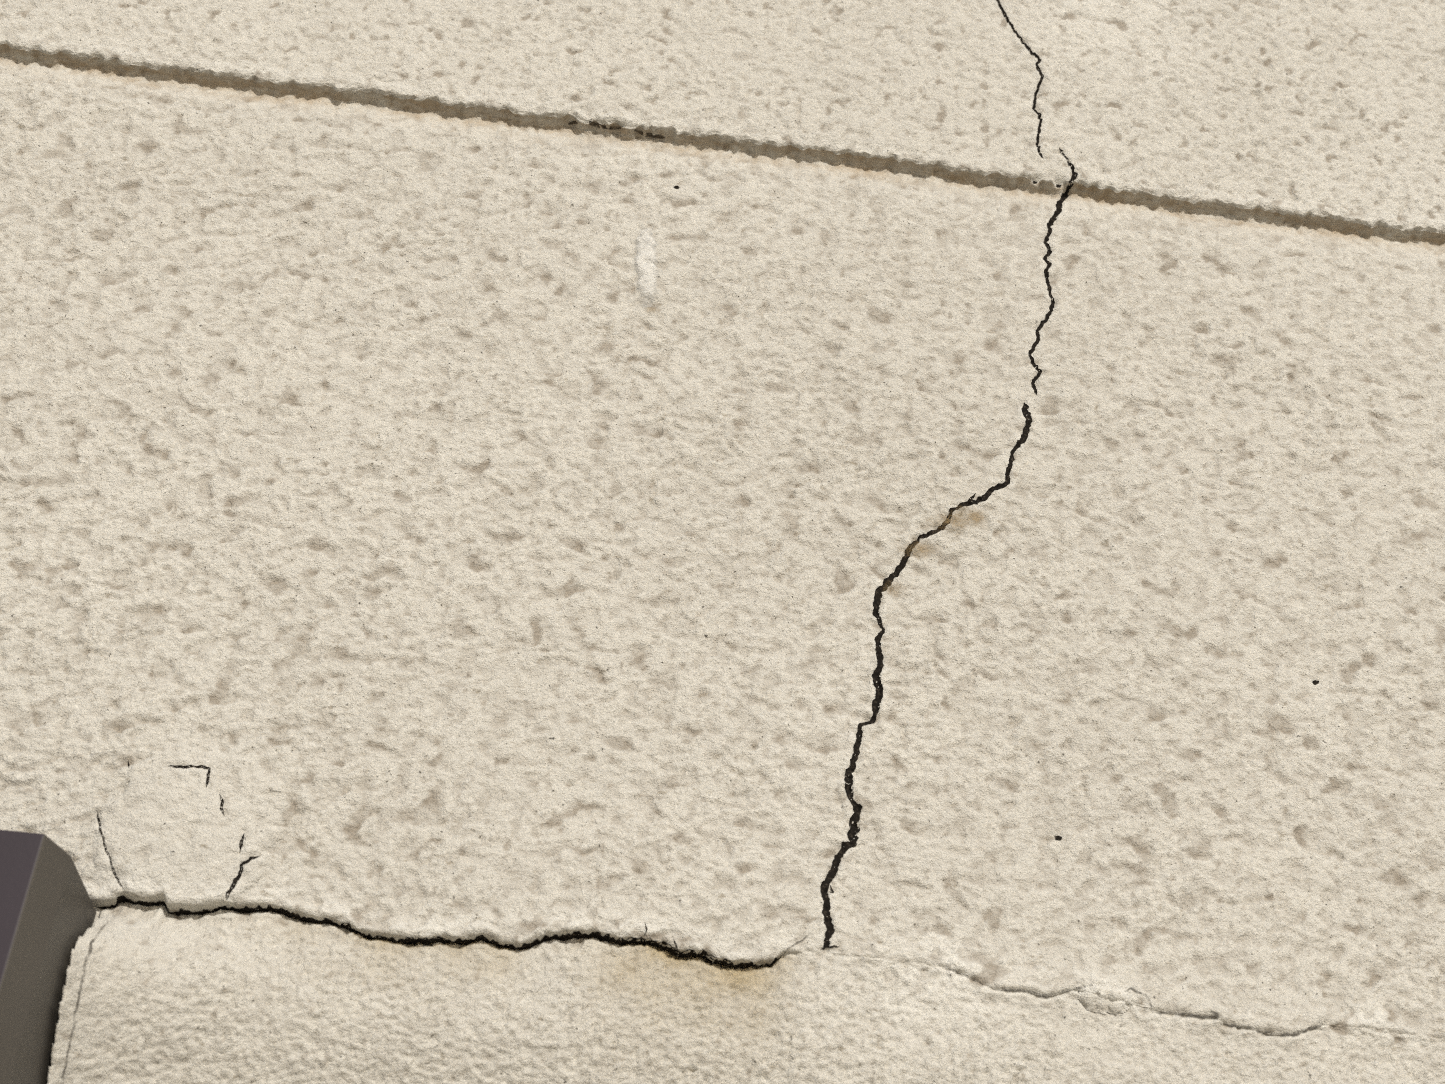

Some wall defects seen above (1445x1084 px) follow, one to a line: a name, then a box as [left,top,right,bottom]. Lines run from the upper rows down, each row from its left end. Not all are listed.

crack [48,0,1079,1076]